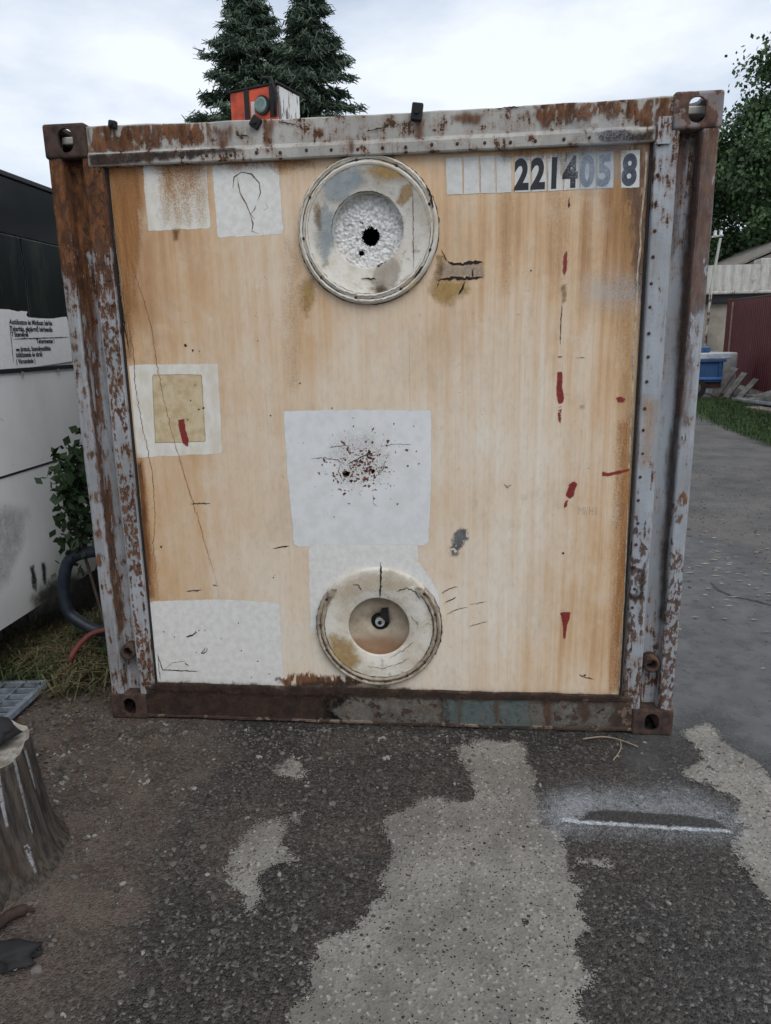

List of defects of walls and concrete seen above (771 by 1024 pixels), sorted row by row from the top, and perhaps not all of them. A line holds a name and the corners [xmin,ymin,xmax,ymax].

corrosion [49,123,315,636]
crack [353,562,420,599]
corrosion [153,97,672,725]
corrosion [659,130,719,620]